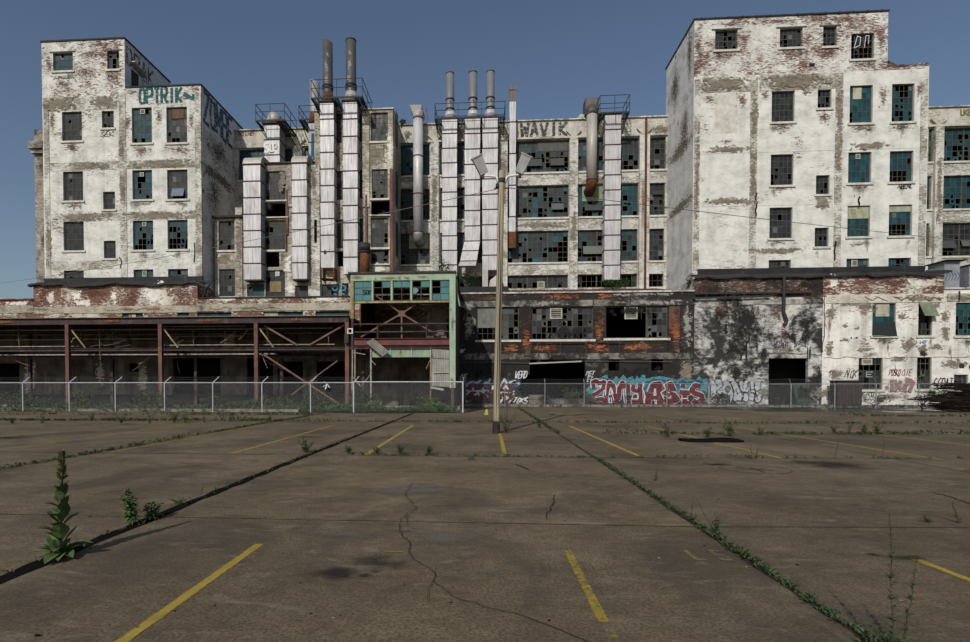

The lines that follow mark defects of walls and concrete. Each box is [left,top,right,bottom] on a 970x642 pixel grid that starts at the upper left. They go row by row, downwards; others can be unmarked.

spalling [42,41,123,135]
spalling [652,16,892,226]
spalling [74,117,235,223]
spalling [46,203,109,266]
spalling [743,240,800,254]
spalling [502,330,556,352]
spalling [465,293,626,306]
spalling [624,299,693,352]
spalling [679,360,695,379]
crack [343,483,589,642]